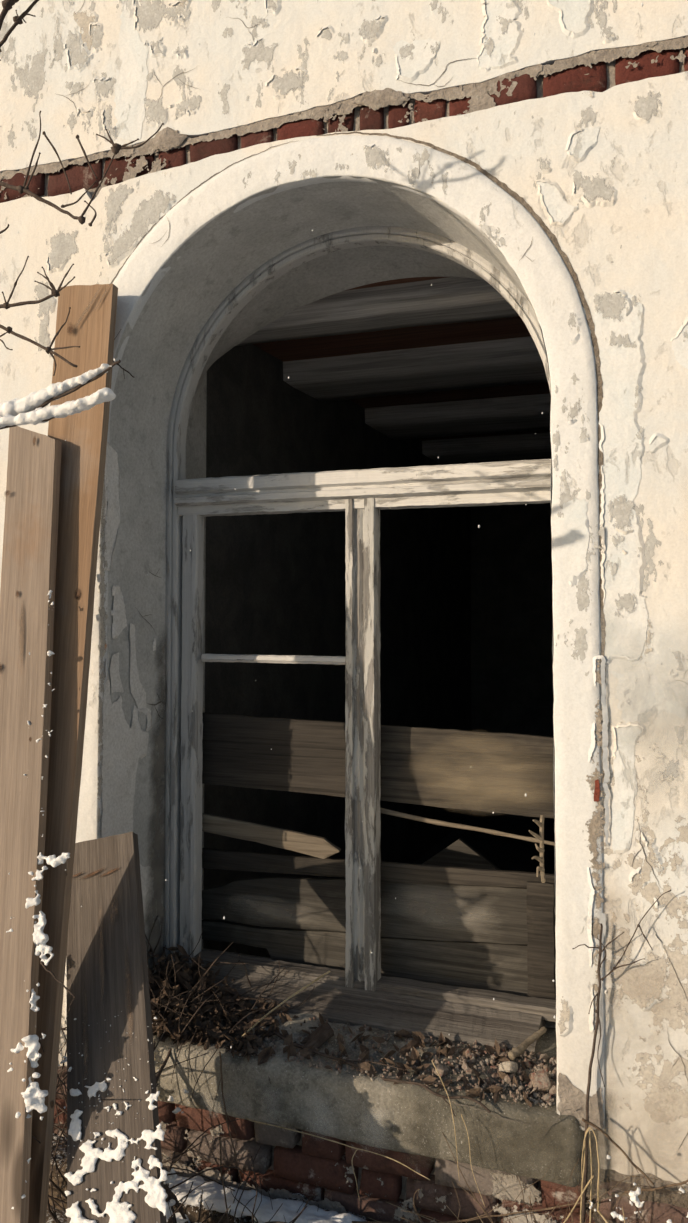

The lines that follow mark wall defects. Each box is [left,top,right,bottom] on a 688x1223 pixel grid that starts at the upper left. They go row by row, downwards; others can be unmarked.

peeling [429,0,453,24]
peeling [477,0,529,72]
peeling [626,41,686,68]
peeling [0,0,201,284]
peeling [335,143,447,192]
peeling [533,106,618,227]
peeling [632,91,662,124]
peeling [96,442,152,838]
peeling [552,289,688,1125]
peeling [140,864,158,969]
flaking render [256,1023,605,1131]
peeling [205,1125,224,1157]